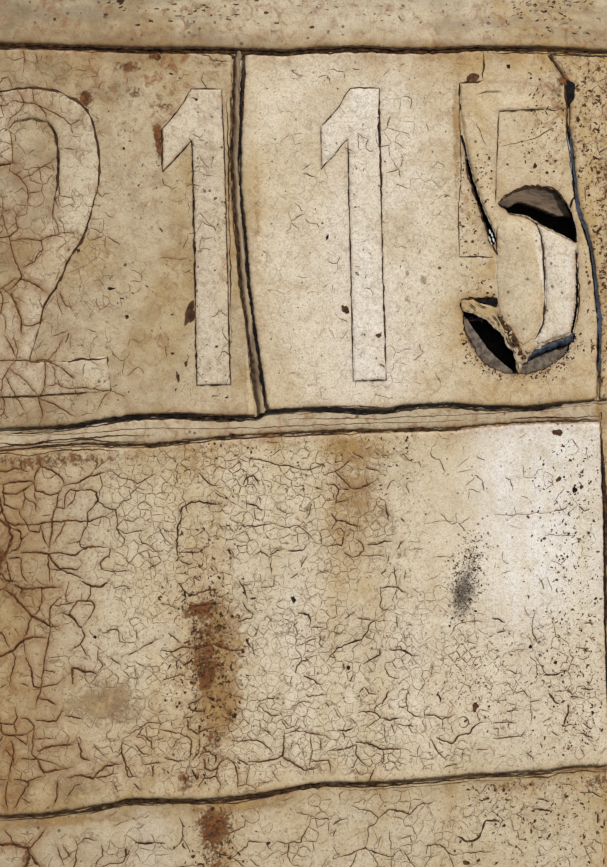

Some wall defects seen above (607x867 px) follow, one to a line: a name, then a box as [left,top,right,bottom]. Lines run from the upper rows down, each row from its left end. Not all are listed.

crack [344,96,450,216]
crack [0,76,120,336]
crack [162,157,218,250]
peeling [499,313,531,368]
crack [424,511,470,534]
crack [459,446,484,499]
crack [497,466,589,529]
crack [539,531,595,594]
corrosion [184,602,233,694]
crack [524,603,544,650]
crack [528,627,601,737]
corrosion [195,804,234,867]